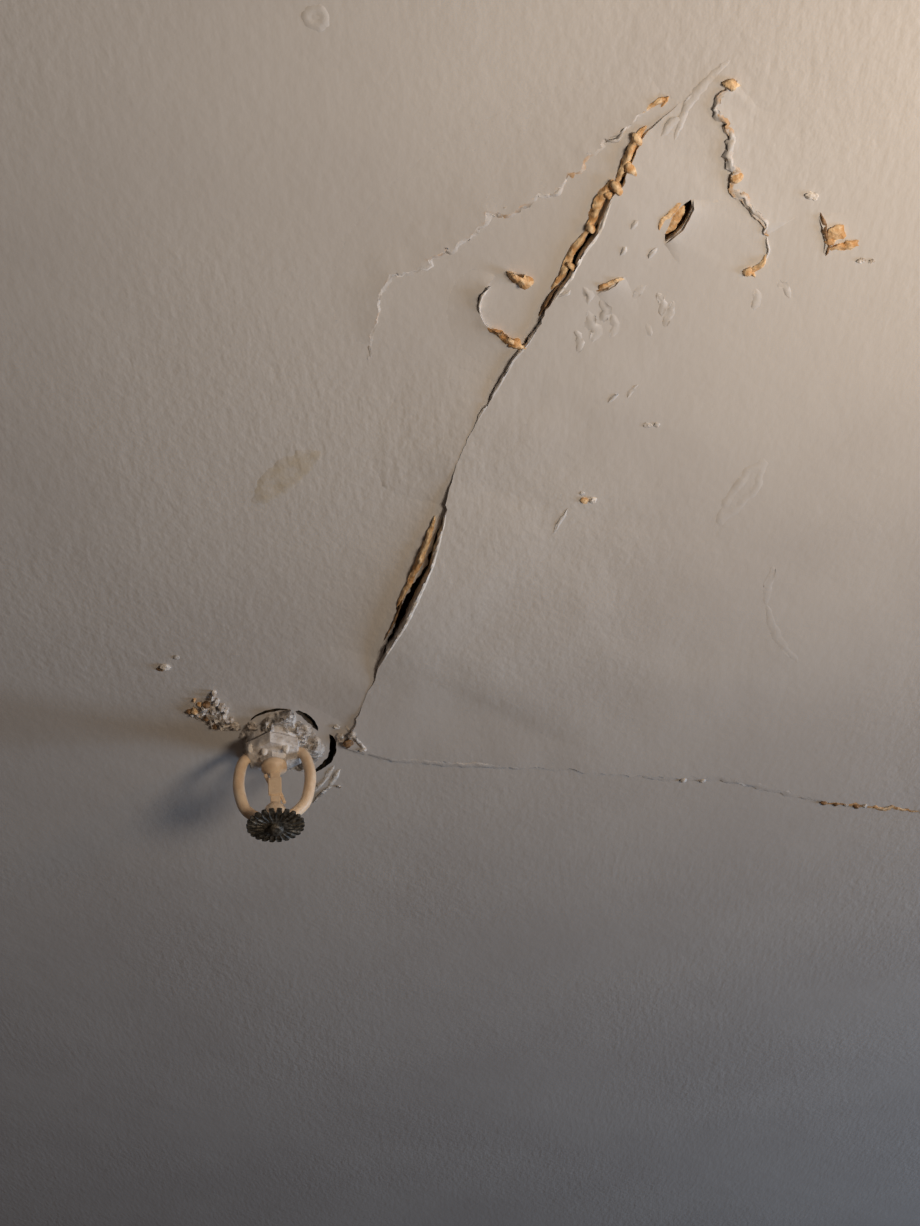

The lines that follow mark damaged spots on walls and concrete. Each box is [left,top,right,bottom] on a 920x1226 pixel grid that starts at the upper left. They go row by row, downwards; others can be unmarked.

peeling [648,79,878,278]
peeling [447,269,534,375]
flaking render [596,277,639,322]
crack [251,60,730,772]
flaking render [186,690,241,732]
crack [633,775,920,812]